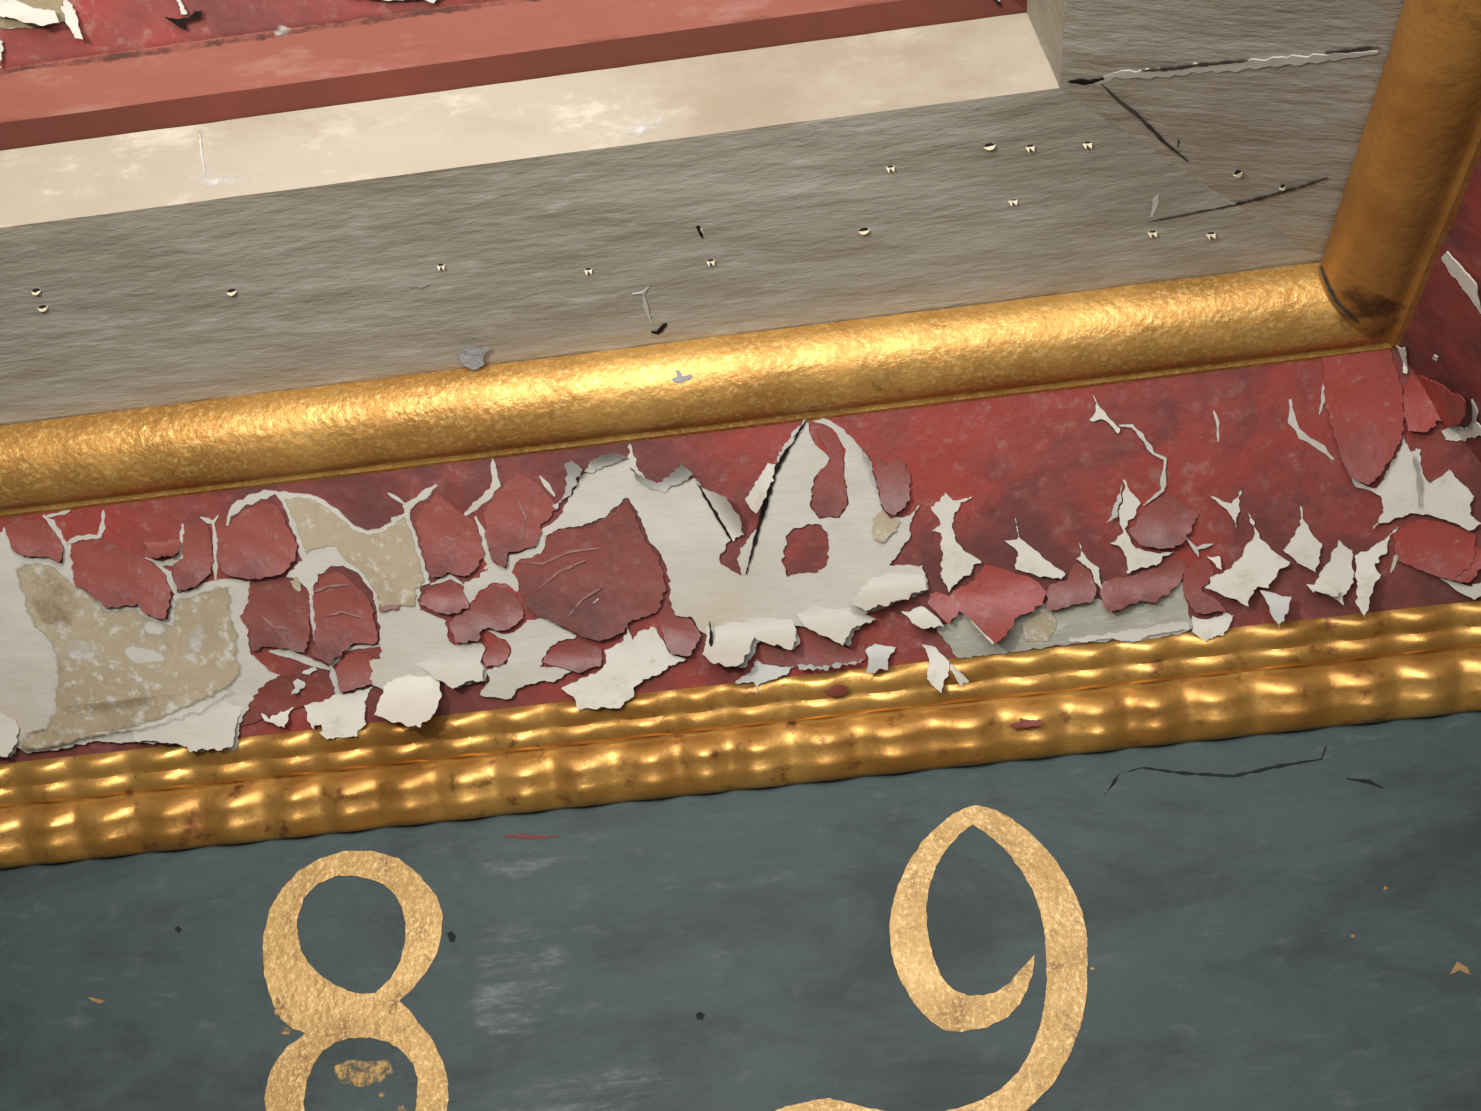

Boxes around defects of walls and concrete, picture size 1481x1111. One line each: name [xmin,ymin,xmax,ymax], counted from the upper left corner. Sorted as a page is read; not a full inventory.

peeling [0,0,83,68]
crack [87,0,459,61]
crack [9,65,35,73]
crack [1068,45,1379,162]
peeling [1441,251,1481,314]
peeling [0,346,1481,758]